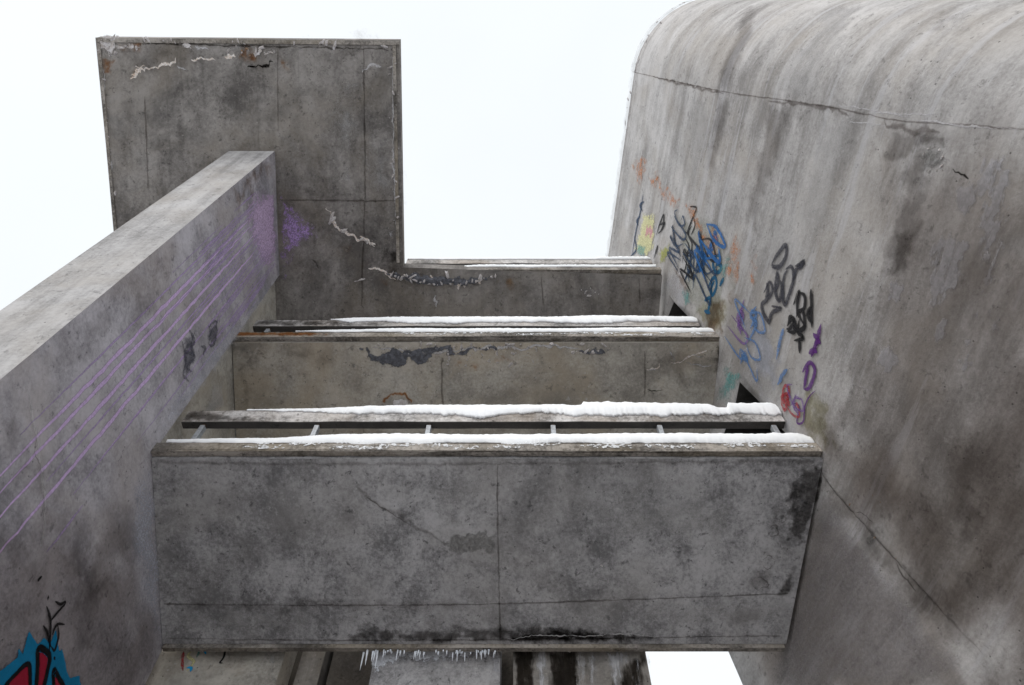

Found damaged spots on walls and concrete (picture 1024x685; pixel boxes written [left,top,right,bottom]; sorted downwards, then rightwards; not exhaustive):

crack [825,105,1019,130]
spalling [387,271,496,290]
peeling [359,341,608,367]